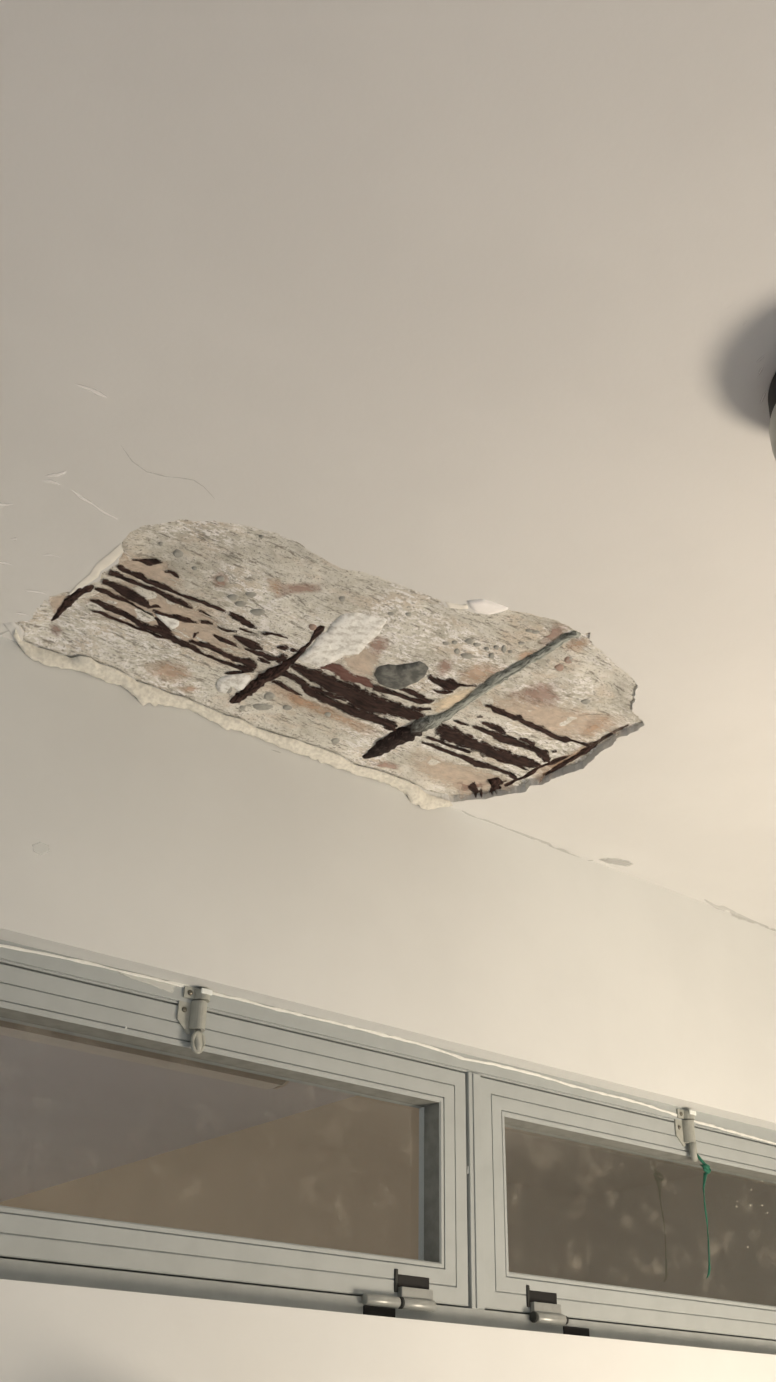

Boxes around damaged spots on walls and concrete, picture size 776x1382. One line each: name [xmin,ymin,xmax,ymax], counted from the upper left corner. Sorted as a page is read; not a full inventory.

rust [49,595,67,632]
spalling [3,519,643,810]
rust [90,553,610,798]